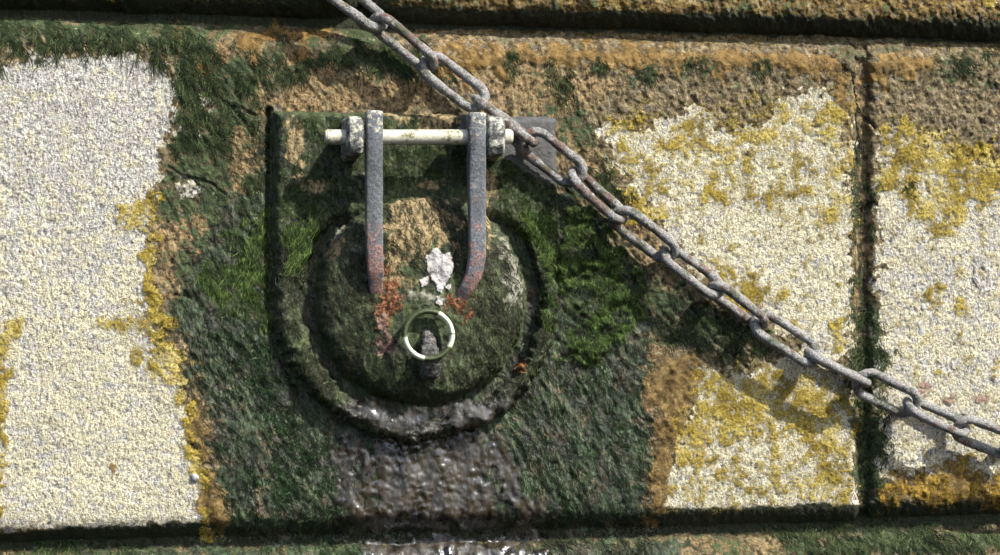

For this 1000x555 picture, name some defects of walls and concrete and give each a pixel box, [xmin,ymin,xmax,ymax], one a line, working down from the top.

rust [373,265,406,357]
rust [442,294,475,326]
damp [312,429,551,555]